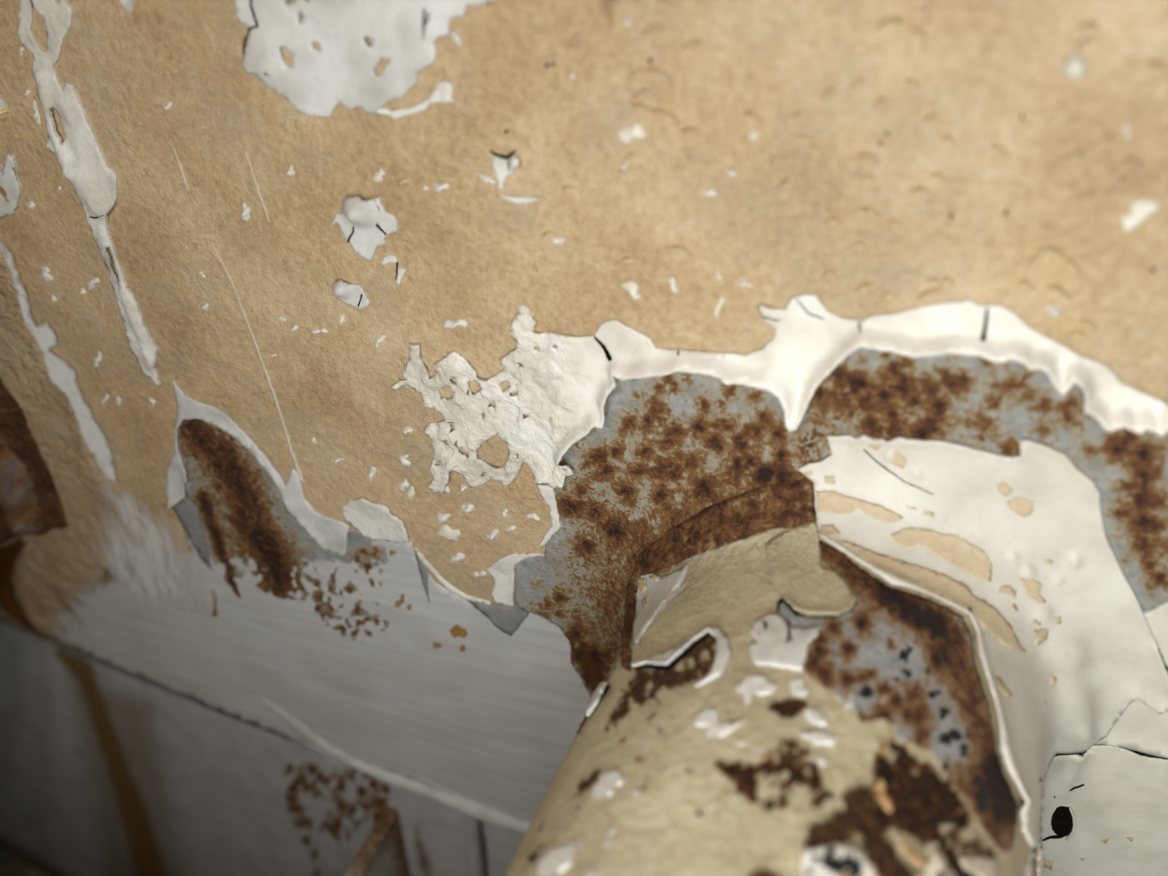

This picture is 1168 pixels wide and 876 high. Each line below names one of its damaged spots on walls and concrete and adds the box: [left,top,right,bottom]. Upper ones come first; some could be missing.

peeling [235,0,491,119]
peeling [477,150,541,204]
corrosion [0,377,68,632]
corrosion [166,348,1168,695]
peeling [391,294,1168,608]
peeling [634,564,688,643]
corrosion [605,637,717,744]
peeling [630,626,730,688]
corrosion [767,698,809,719]
peeling [735,434,1168,876]
corrosion [283,757,391,876]
corrosion [685,739,998,876]